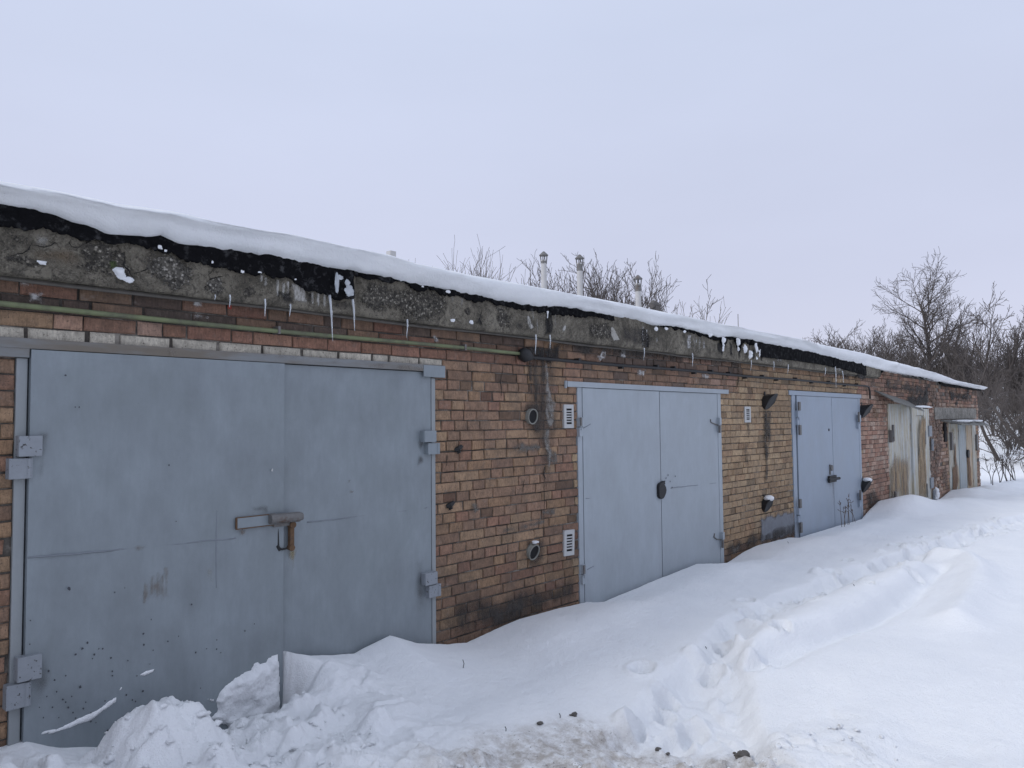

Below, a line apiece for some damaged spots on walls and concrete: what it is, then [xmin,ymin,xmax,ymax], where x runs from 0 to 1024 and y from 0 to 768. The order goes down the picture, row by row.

leakage [518,314,740,445]
leakage [458,585,573,628]